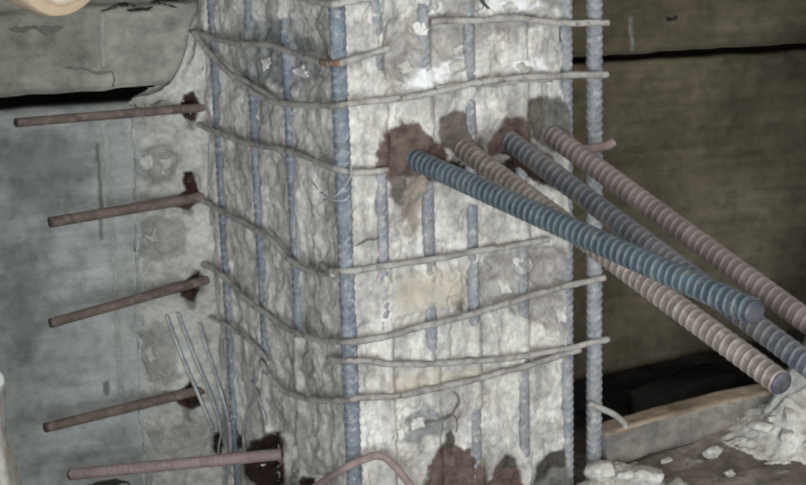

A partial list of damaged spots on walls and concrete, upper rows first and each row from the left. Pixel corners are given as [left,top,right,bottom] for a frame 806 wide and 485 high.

crack [9,26,64,35]
crack [101,0,192,12]
spalling [376,0,573,142]
corrosion [487,117,556,189]
spalling [328,0,363,485]
spalling [421,180,438,360]
corrosion [48,275,210,328]
corrosion [43,386,205,433]
spalling [561,355,574,485]
crack [92,477,130,485]
corrosion [67,432,285,485]
corrosion [425,430,522,485]